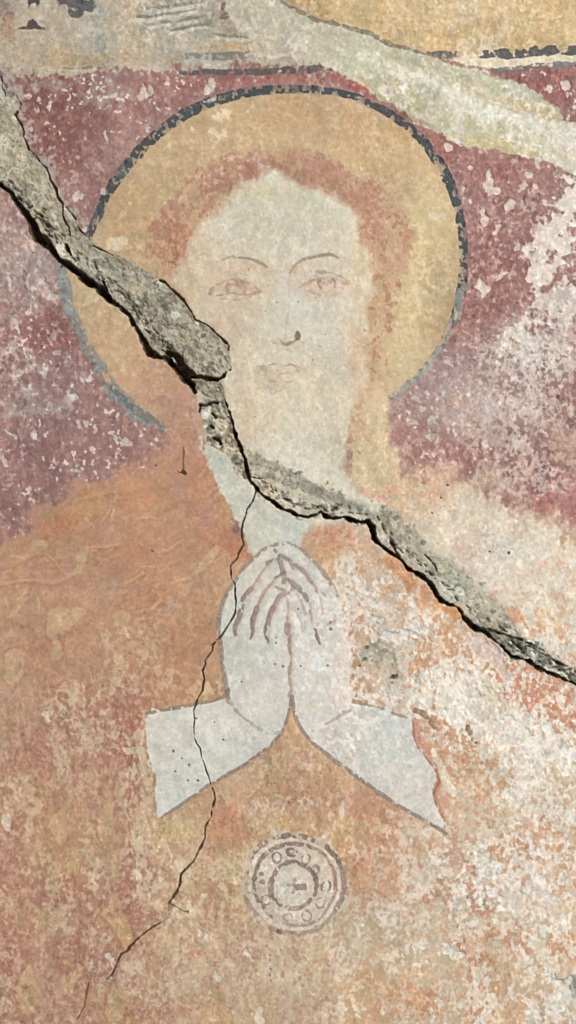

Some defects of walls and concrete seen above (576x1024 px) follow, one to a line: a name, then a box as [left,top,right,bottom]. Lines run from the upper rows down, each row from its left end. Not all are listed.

crack [0,76,231,395]
flaking render [0,78,576,783]
crack [106,399,576,980]
peeling [2,814,12,831]
peeling [476,851,573,925]
peeling [442,943,465,960]
peeling [252,1006,266,1024]
peeling [547,969,576,1024]